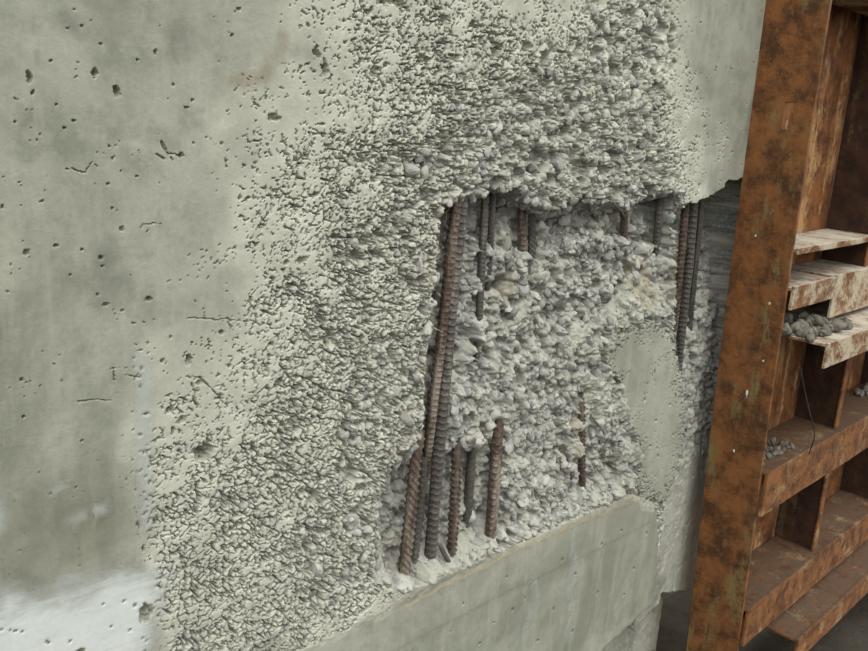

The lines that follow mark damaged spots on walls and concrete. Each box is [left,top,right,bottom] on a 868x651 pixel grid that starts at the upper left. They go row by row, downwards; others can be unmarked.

hole [166,404,188,424]
spalling [370,178,742,651]